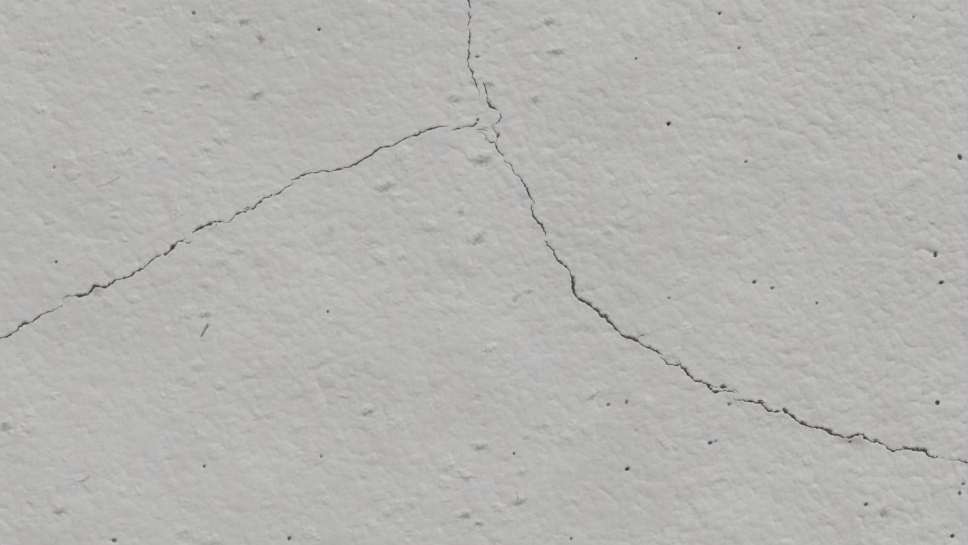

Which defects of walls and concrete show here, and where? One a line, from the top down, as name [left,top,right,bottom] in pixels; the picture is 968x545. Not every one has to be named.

crack [0,239,191,339]
crack [192,0,968,463]